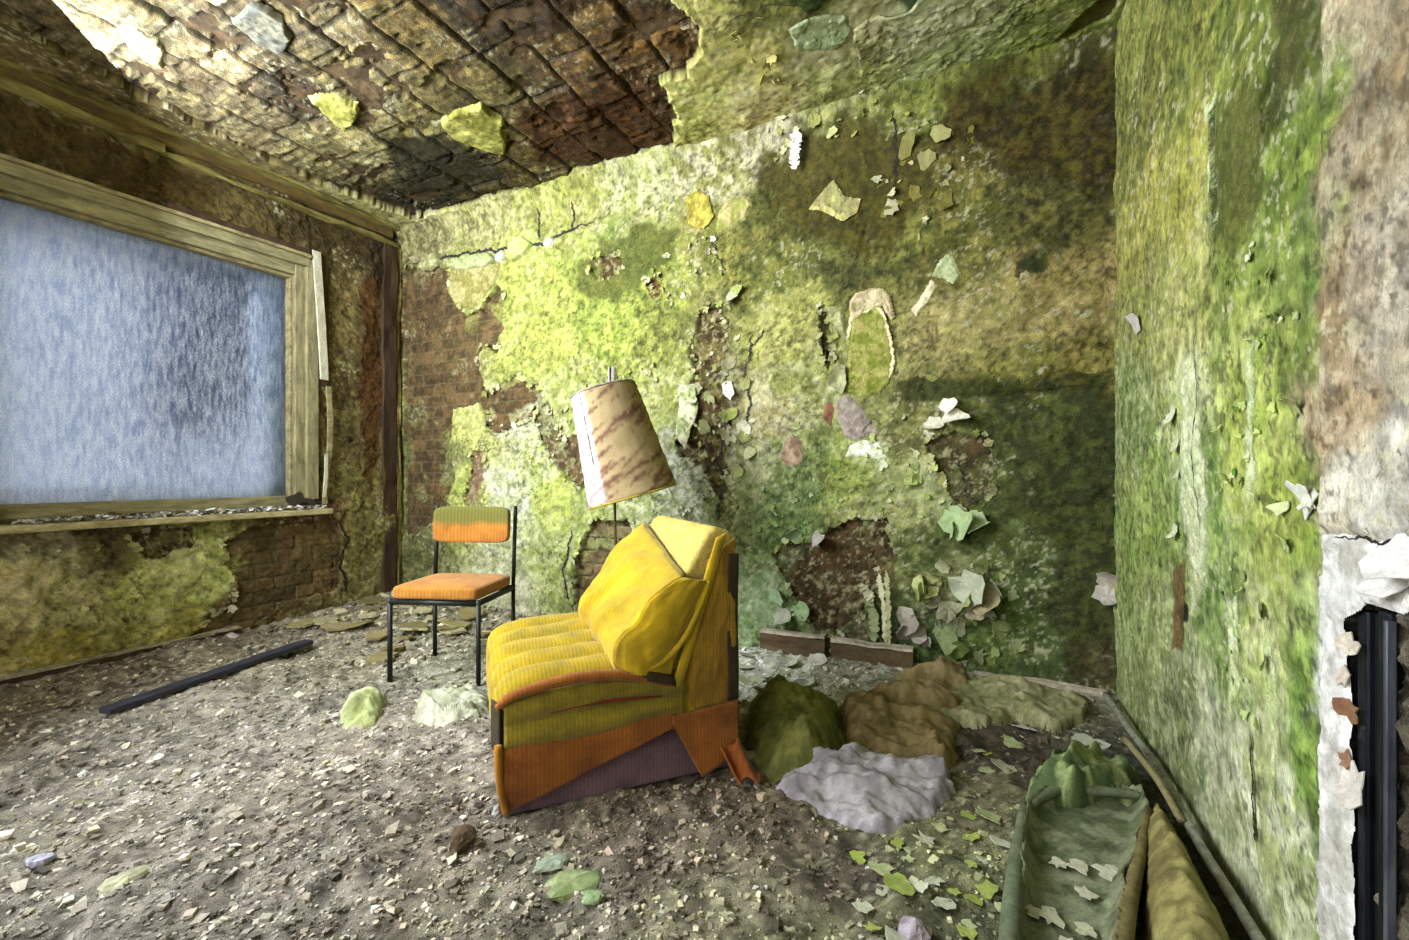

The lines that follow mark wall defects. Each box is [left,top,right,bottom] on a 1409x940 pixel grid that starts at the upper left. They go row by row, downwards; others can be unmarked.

peeling [0,512,350,674]
damp [386,136,518,204]
spalling [403,264,585,535]
crack [408,202,603,265]
damp [517,89,667,163]
spalling [566,191,756,611]
spalling [739,288,998,692]
damp [757,55,1116,256]
peeling [895,560,1029,667]
flaking render [894,252,1110,382]
damp [896,373,1116,666]
damp [1179,358,1207,611]